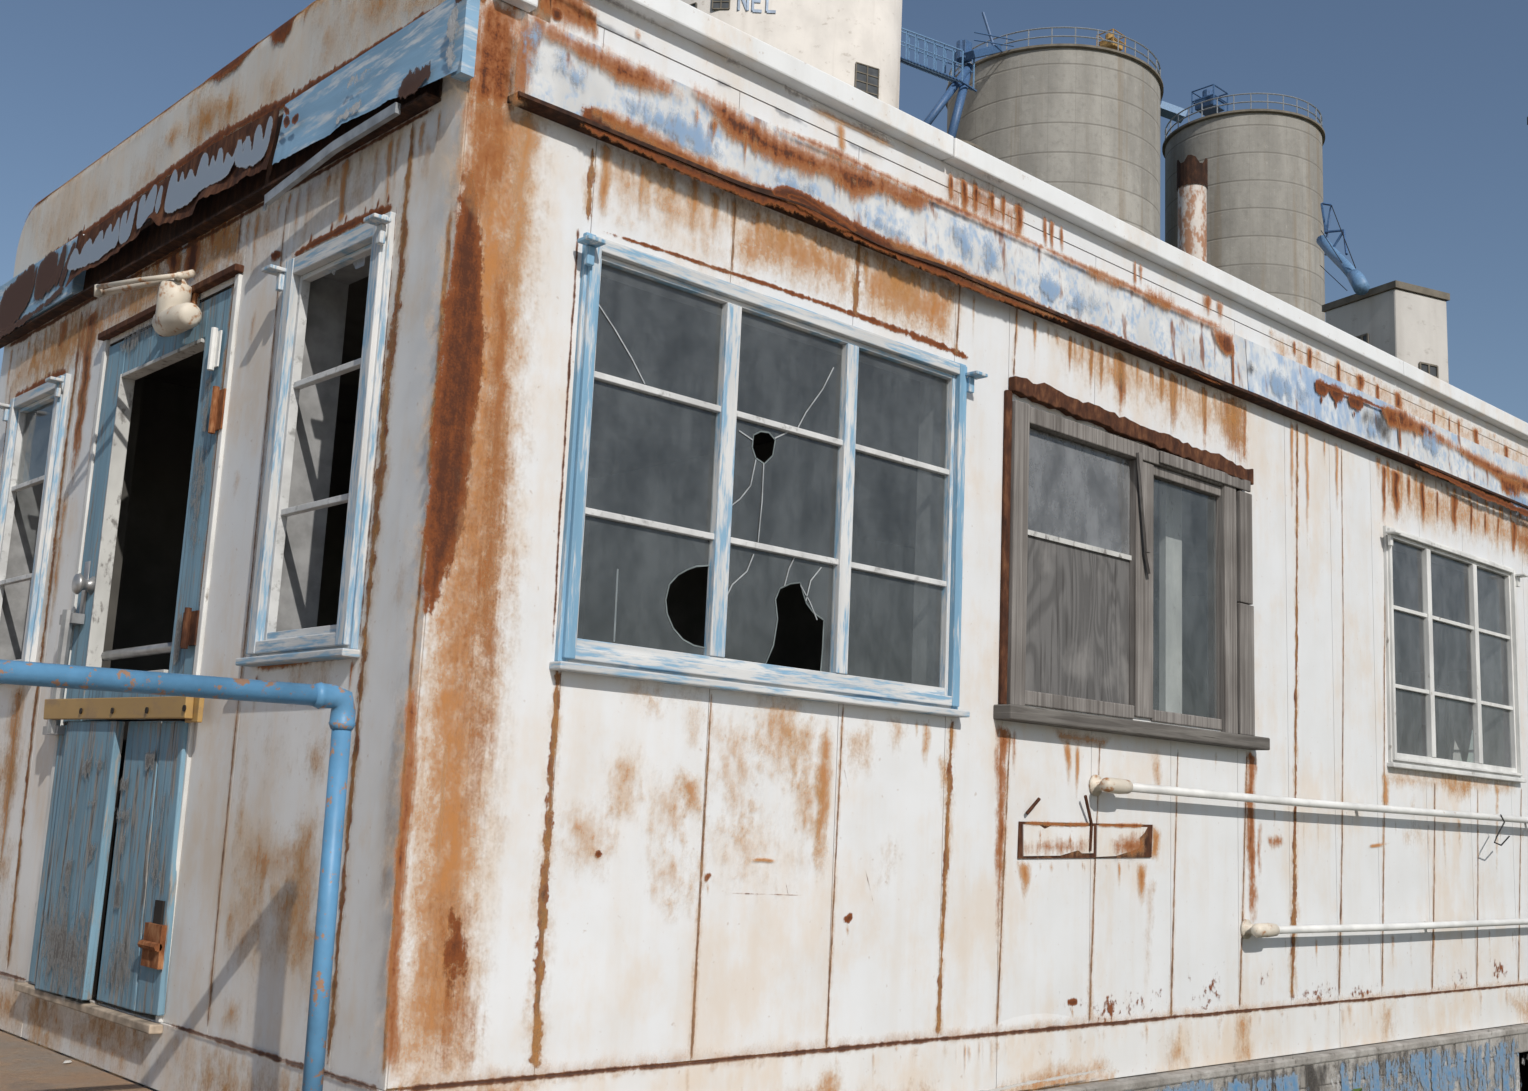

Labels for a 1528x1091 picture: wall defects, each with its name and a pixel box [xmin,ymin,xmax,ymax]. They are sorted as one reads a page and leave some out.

peeling [0,106,299,340]
rust [26,0,437,252]
peeling [398,0,462,100]
rust [8,110,440,1091]
rust [383,0,1528,1091]
rust [0,686,39,981]
peeling [1156,1072,1299,1091]
peeling [1331,1039,1523,1091]